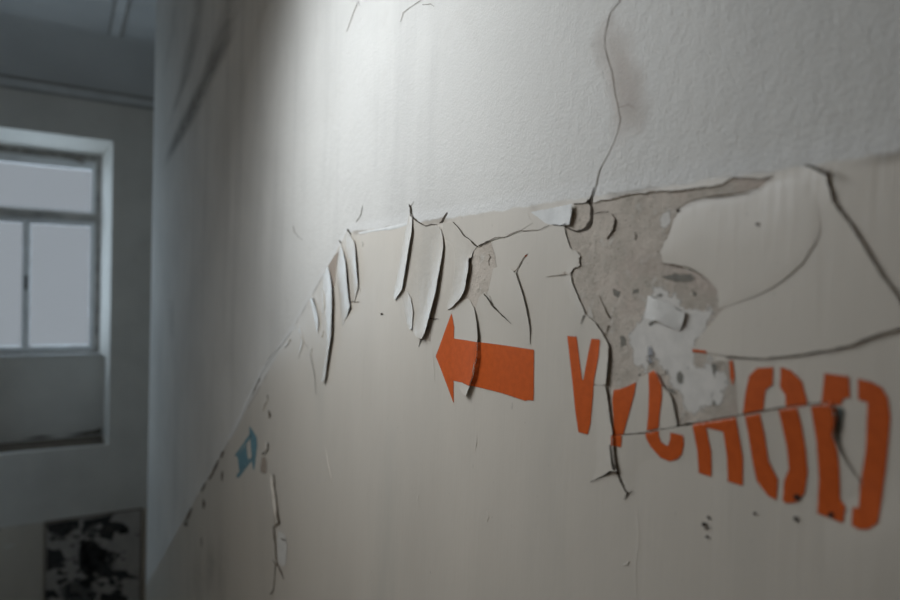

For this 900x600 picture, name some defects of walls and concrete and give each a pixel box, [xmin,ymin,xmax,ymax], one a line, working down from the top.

crack [552,0,634,232]
flaking render [228,177,772,481]
crack [261,441,287,594]
crack [591,402,828,600]